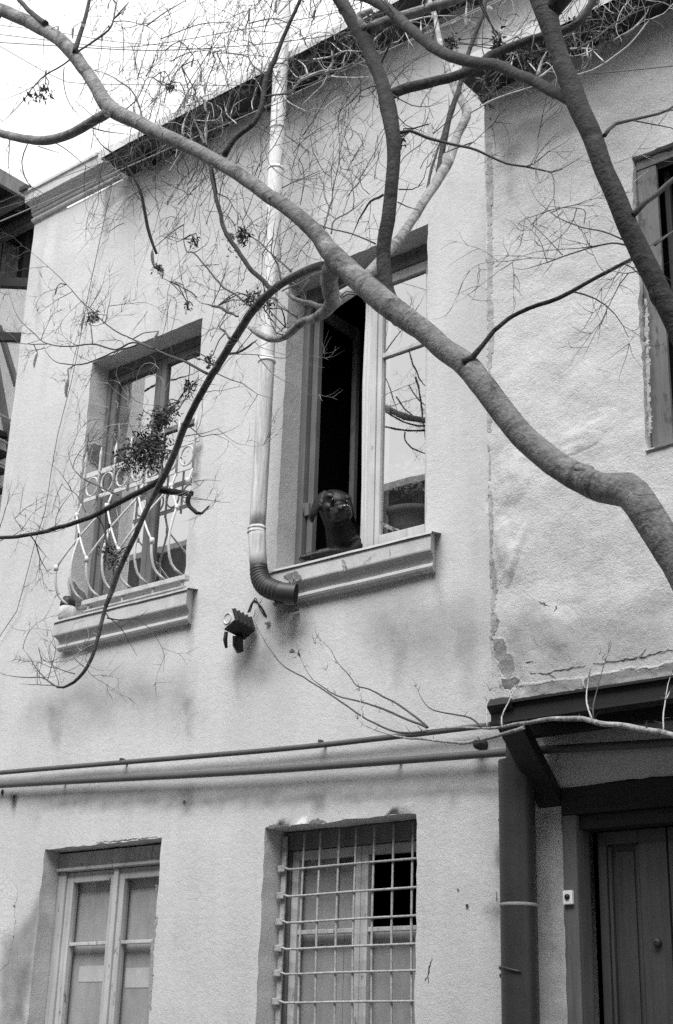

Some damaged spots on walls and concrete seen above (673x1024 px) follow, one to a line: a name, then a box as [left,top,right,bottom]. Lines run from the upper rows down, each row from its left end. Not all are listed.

spalling [485,141,494,374]
spalling [487,412,673,700]
crack [525,649,673,678]